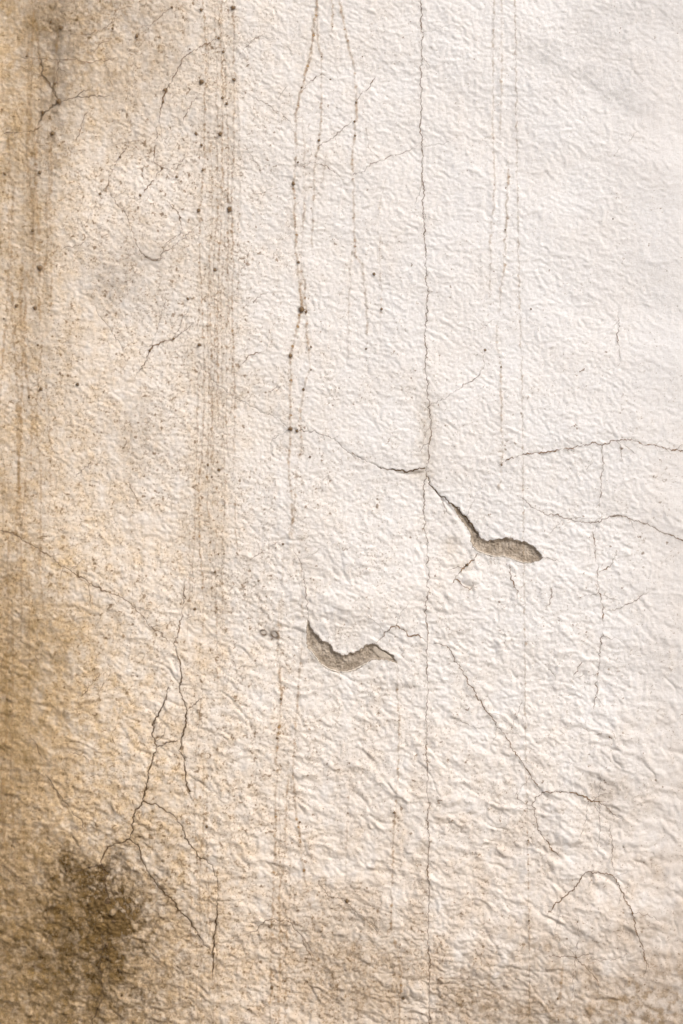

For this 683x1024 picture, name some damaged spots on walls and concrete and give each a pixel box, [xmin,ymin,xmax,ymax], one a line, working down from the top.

crack [4,22,112,137]
crack [354,2,602,855]
flaking render [451,504,543,563]
crack [506,439,683,543]
flaking render [306,621,397,673]
crack [575,566,640,703]
crack [0,530,218,973]
leakage [0,850,158,1024]
crack [425,802,433,977]
crack [551,844,647,964]